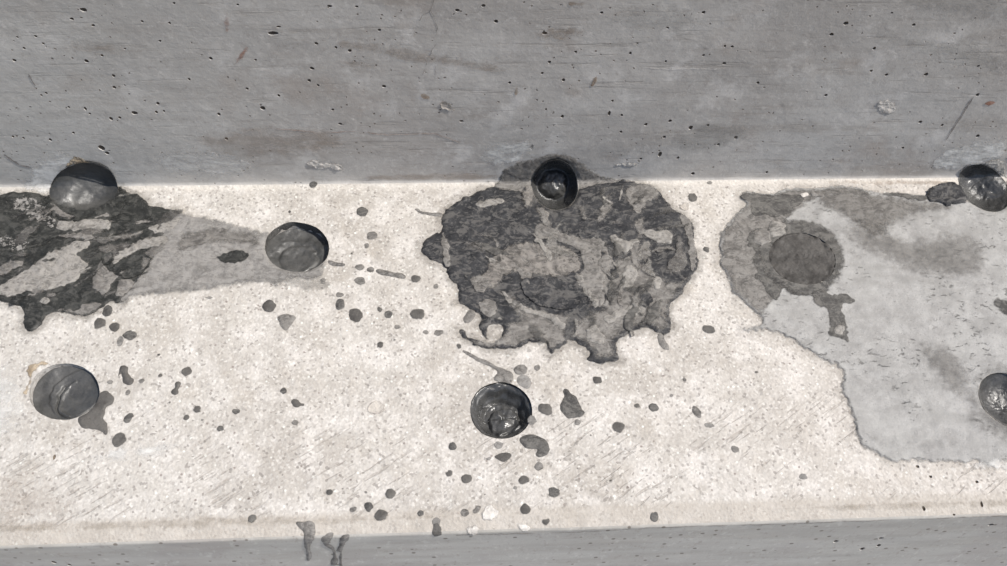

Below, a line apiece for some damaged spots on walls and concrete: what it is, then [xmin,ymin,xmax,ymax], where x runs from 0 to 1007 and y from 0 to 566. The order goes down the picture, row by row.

damp [884,192,927,200]
damp [179,228,258,249]
damp [740,193,855,342]
damp [994,298,1007,314]